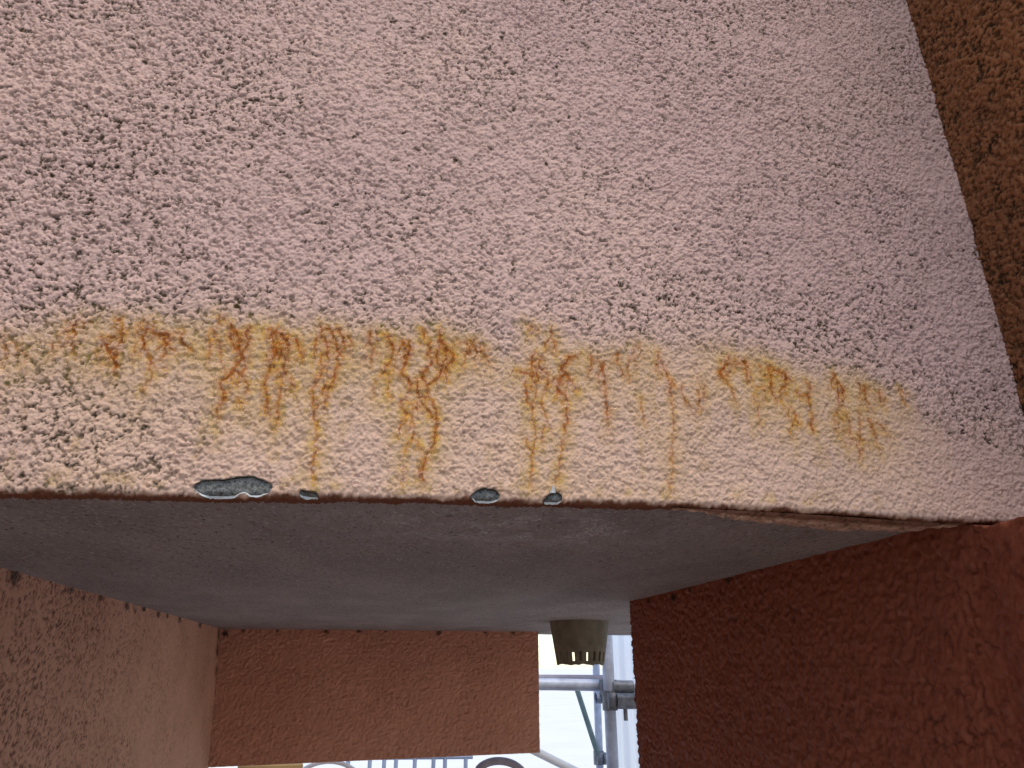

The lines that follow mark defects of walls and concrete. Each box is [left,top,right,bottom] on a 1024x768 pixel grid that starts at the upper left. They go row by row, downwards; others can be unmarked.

corrosion [205,316,356,487]
corrosion [369,325,488,488]
corrosion [514,325,581,488]
corrosion [718,359,817,434]
corrosion [831,374,889,454]
peeling [194,476,272,499]
peeling [299,490,318,500]
peeling [470,488,499,504]
peeling [543,485,562,505]